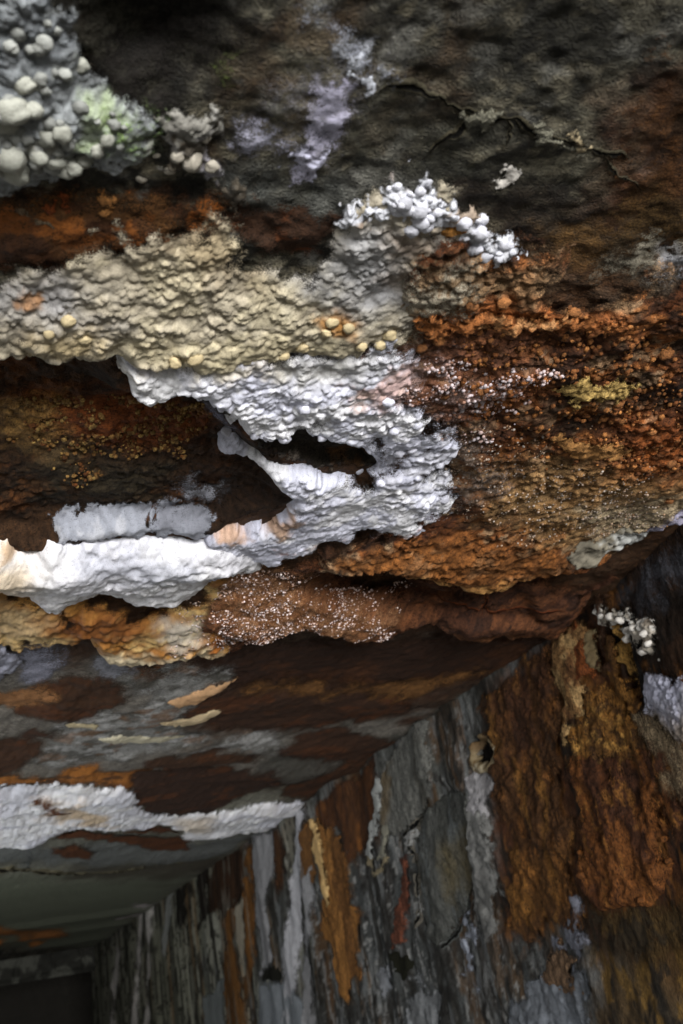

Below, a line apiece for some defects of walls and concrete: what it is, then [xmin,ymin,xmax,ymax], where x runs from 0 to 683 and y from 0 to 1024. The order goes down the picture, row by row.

rust [0,182,344,277]
crack [380,78,641,193]
rust [601,73,683,290]
leakage [0,0,528,1024]
rust [0,234,683,1024]
leakage [566,510,683,801]
spalling [259,965,282,985]
spalling [388,951,414,981]